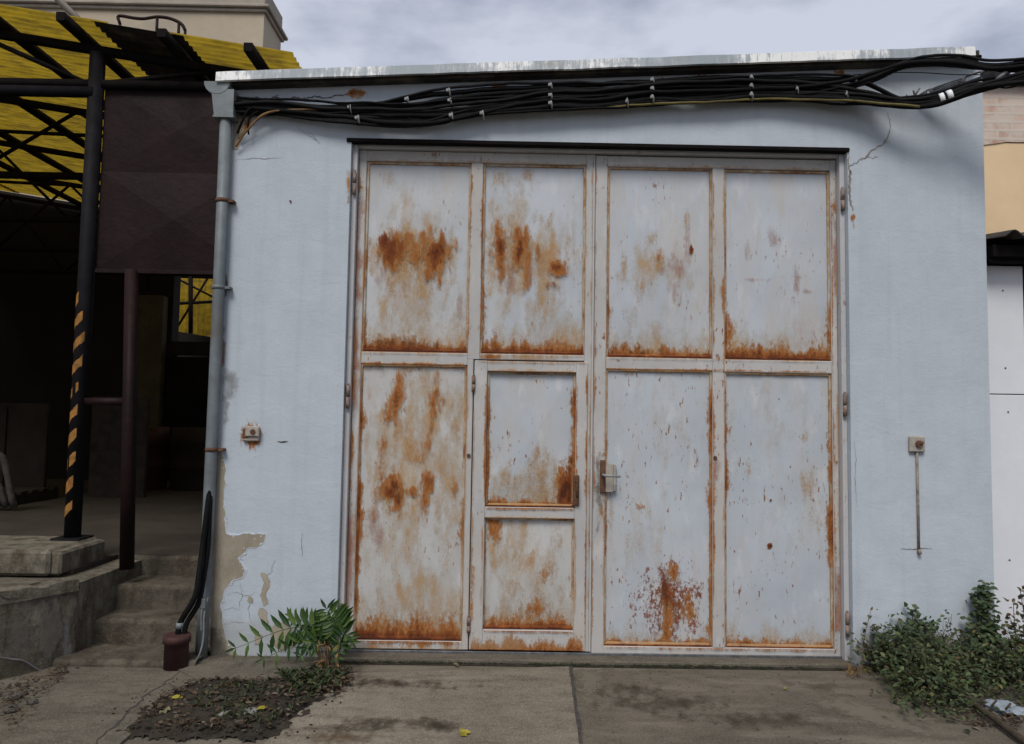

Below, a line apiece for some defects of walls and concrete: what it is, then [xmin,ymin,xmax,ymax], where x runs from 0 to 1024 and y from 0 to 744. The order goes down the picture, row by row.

corrosion [346,89,365,98]
crack [848,116,891,209]
corrosion [346,160,841,652]
flaking render [209,445,268,656]
peeling [248,573,294,652]